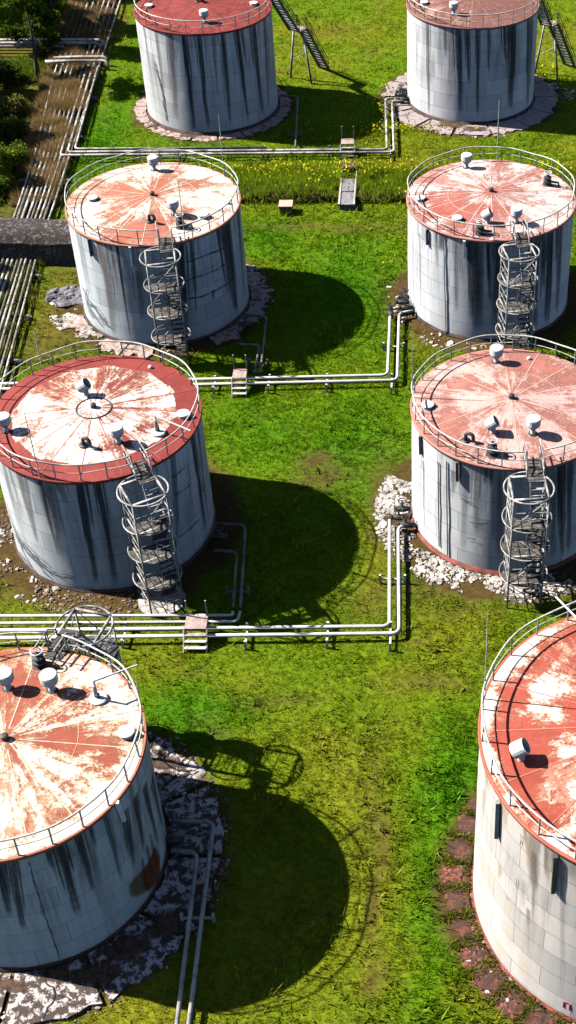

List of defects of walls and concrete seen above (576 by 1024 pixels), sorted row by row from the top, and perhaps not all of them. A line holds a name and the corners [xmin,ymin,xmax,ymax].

water stain [182,25,267,123]
water stain [426,17,533,103]
water stain [176,240,196,315]
water stain [217,210,243,304]
water stain [468,242,503,313]
water stain [530,228,562,313]
water stain [76,483,115,573]
water stain [551,462,573,545]
water stain [0,861,24,922]
water stain [46,828,93,909]
corrosion [131,835,160,895]
crack [29,863,118,1018]